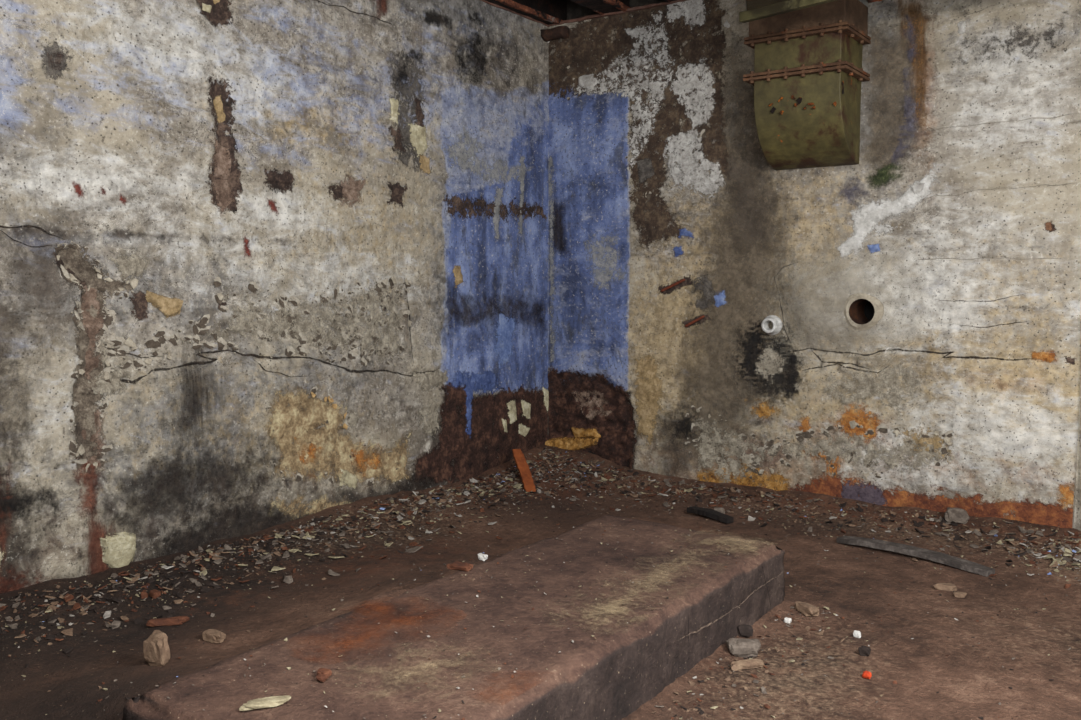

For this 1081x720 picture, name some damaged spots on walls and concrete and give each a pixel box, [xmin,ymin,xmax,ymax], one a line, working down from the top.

rust [377,0,387,15]
spalling [205,77,246,214]
peeling [548,0,730,257]
damp [841,0,926,203]
crack [0,225,58,247]
damp [629,44,786,476]
spalling [53,241,412,522]
crack [103,287,439,384]
spalling [545,366,638,469]
rust [837,405,880,443]
damp [112,447,293,558]
rust [697,450,1074,528]